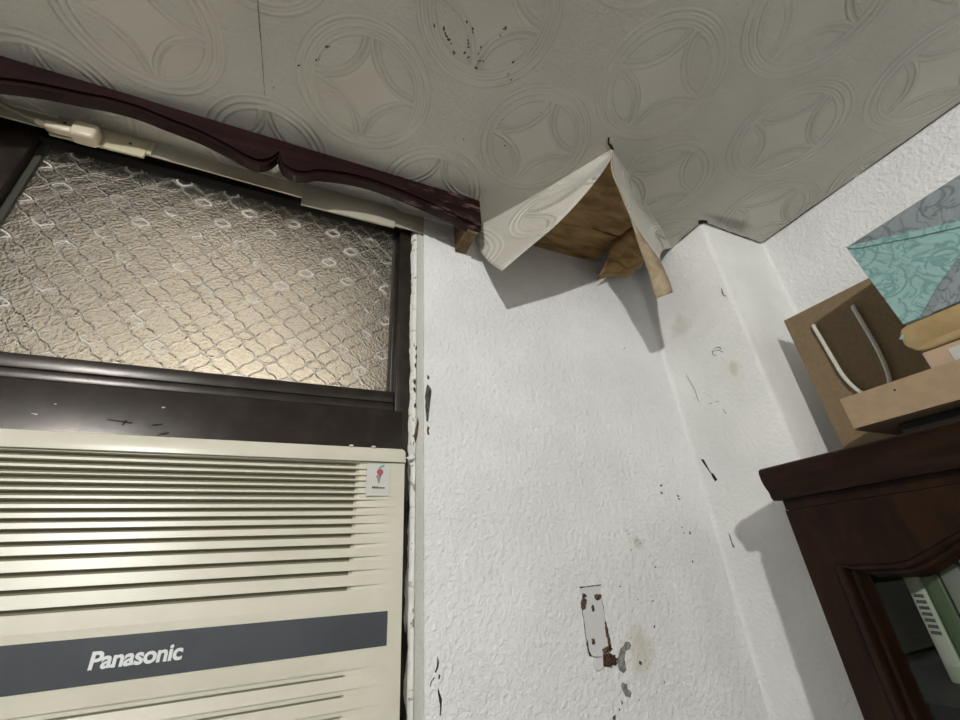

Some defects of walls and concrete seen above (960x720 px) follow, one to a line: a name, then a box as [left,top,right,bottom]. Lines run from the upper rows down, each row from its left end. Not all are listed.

peeling [475,137,673,298]
spalling [425,375,433,435]
rust [579,585,602,612]
rust [586,618,618,668]